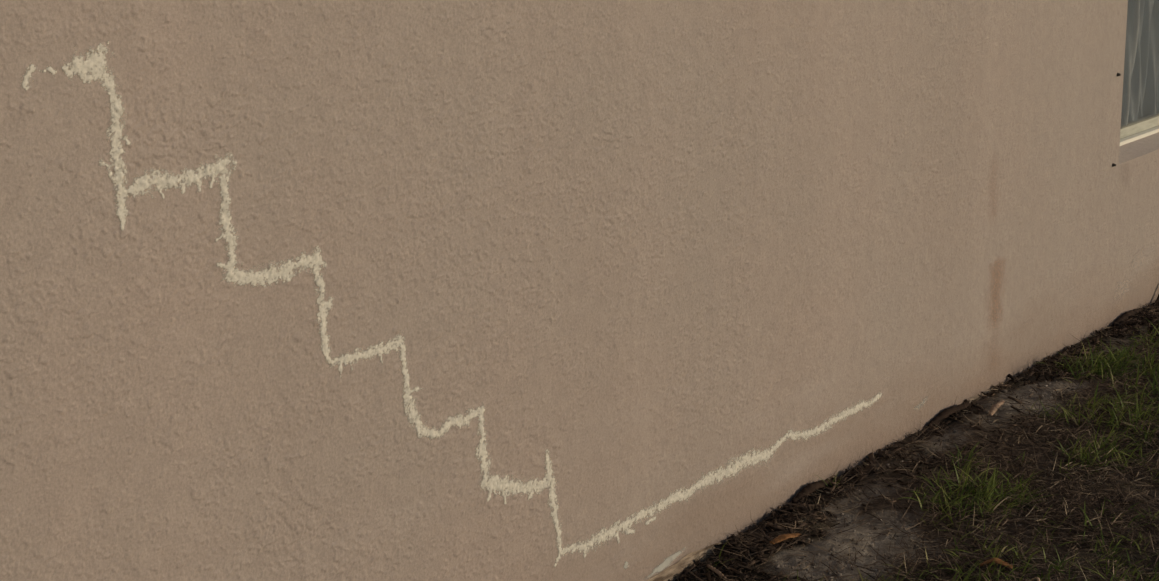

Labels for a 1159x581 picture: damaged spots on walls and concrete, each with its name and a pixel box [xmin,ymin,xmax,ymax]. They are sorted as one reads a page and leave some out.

crack [22,41,882,567]